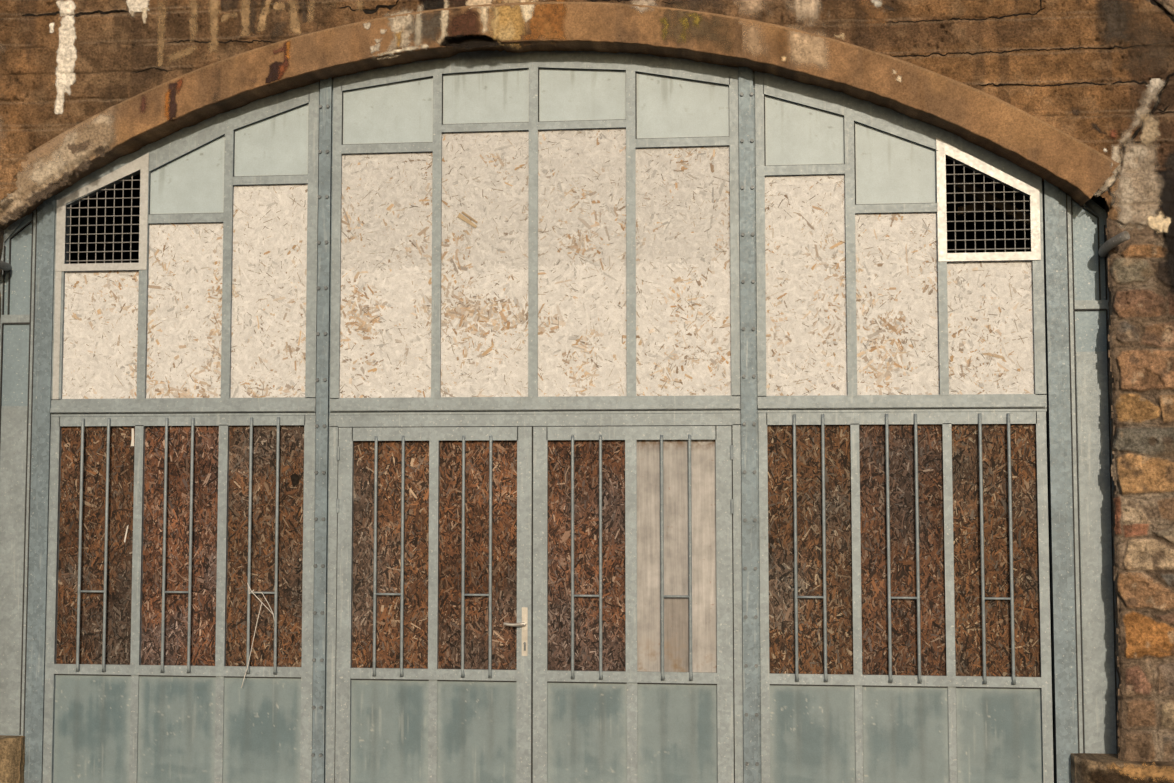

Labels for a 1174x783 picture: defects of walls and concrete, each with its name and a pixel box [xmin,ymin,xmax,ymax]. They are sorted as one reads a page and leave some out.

crack [886,0,1044,23]
crack [1150,0,1174,23]
leakage [49,0,77,114]
corrosion [266,41,290,83]
crack [893,45,1143,57]
corrosion [165,79,182,121]
crack [978,73,1174,209]
leakage [1097,0,1174,293]
spalling [0,114,114,224]
leakage [1090,769,1174,783]